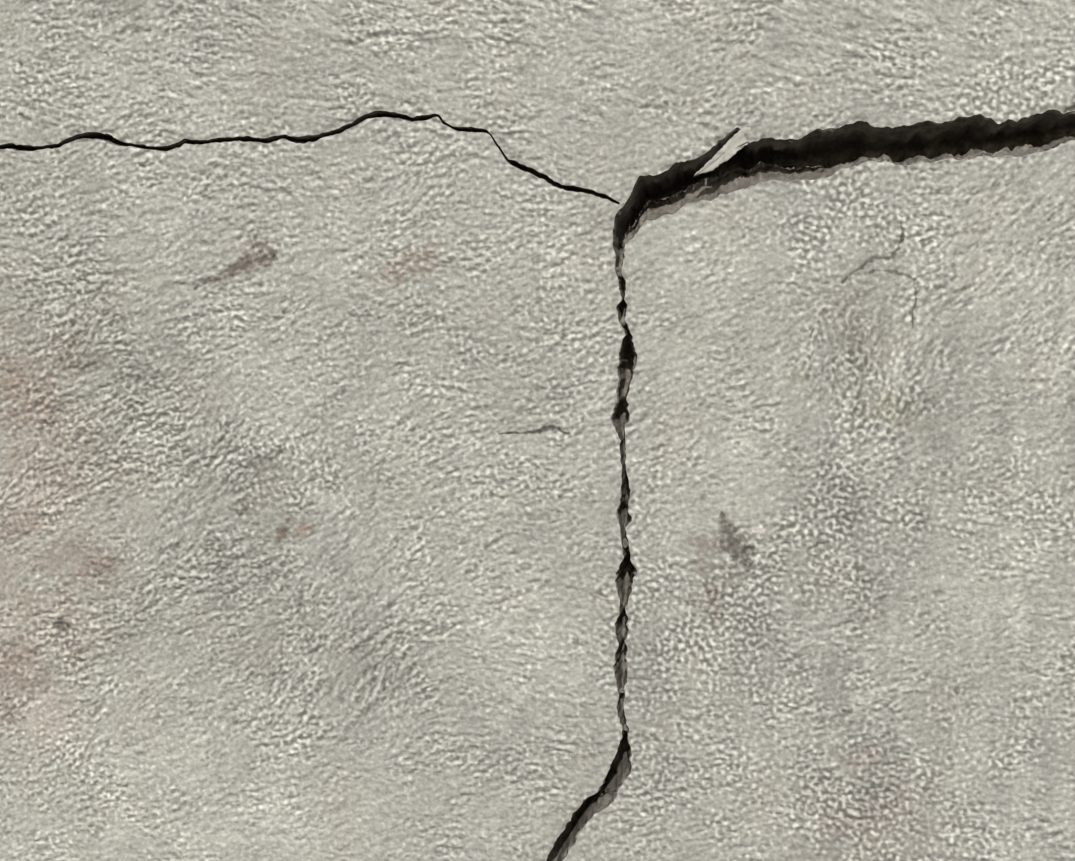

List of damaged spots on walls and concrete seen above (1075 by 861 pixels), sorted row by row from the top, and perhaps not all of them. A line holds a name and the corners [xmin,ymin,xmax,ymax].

crack [0,110,620,204]
crack [501,425,569,434]
crack [546,105,1075,861]